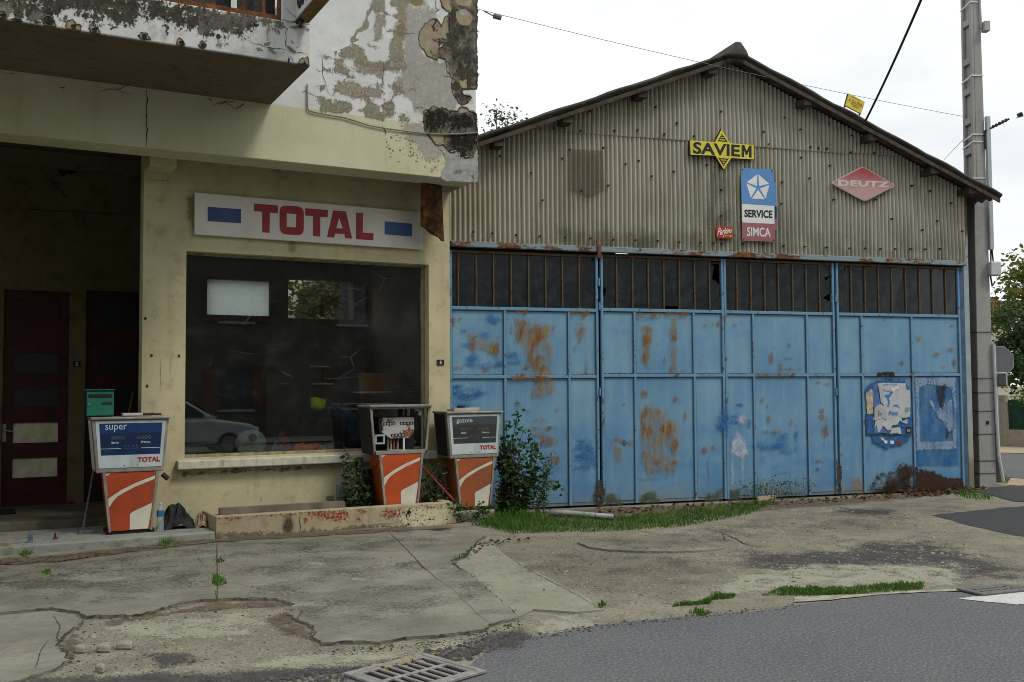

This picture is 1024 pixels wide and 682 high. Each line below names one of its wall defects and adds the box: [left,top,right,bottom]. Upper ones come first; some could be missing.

flaking render [41,15,101,34]
flaking render [256,21,310,67]
crack [59,86,148,147]
flaking render [317,0,481,183]
rust [511,309,554,398]
rust [613,389,687,474]
peeling [865,376,959,466]
crack [1,522,597,679]